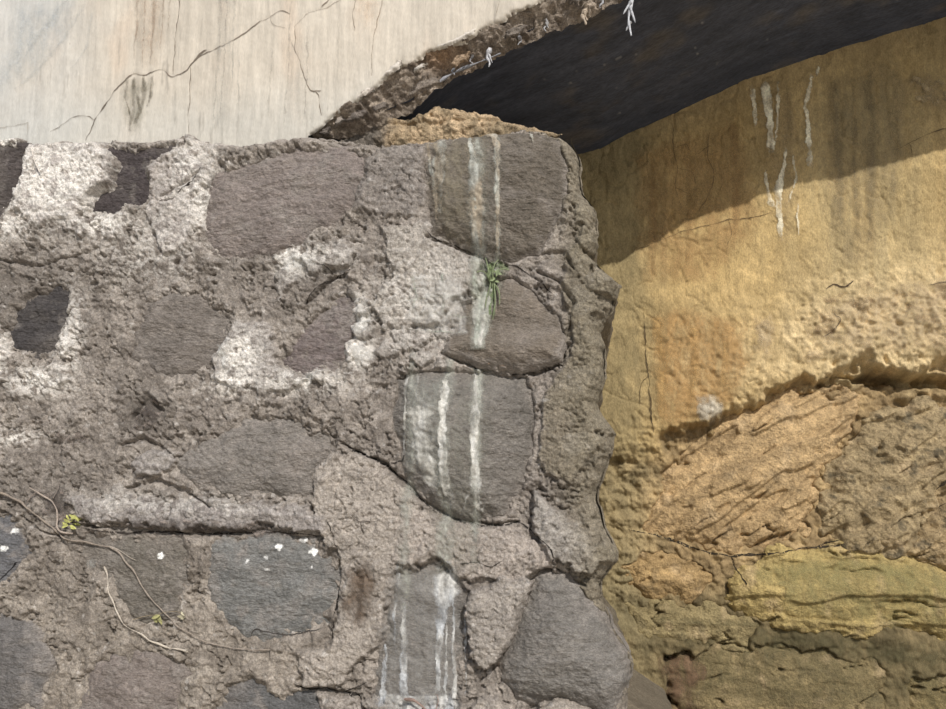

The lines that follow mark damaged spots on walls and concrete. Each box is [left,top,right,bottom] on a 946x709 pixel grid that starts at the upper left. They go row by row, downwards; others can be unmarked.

crack [51,0,382,138]
spalling [312,0,623,140]
water stain [751,67,820,231]
water stain [411,134,506,350]
water stain [403,360,453,540]
water stain [465,367,483,531]
water stain [379,552,467,709]
crack [628,529,842,585]